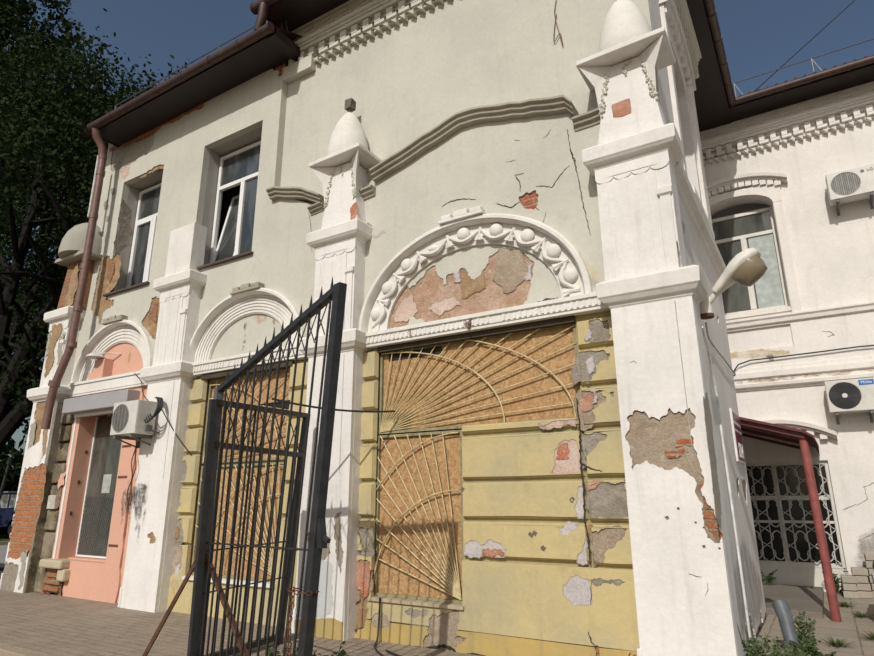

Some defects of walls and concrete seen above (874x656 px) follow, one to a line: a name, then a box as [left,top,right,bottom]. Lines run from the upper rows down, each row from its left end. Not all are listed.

flaking render [109,103,204,178]
crack [497,129,591,236]
flaking render [92,188,132,324]
flaking render [142,297,160,339]
flaking render [389,247,534,329]
flaking render [538,318,614,475]
flaking render [2,401,48,591]
peeling [316,512,344,618]
peeling [463,539,507,558]
flaking render [557,479,628,606]
flaking render [626,392,724,550]
flaking render [405,608,467,651]